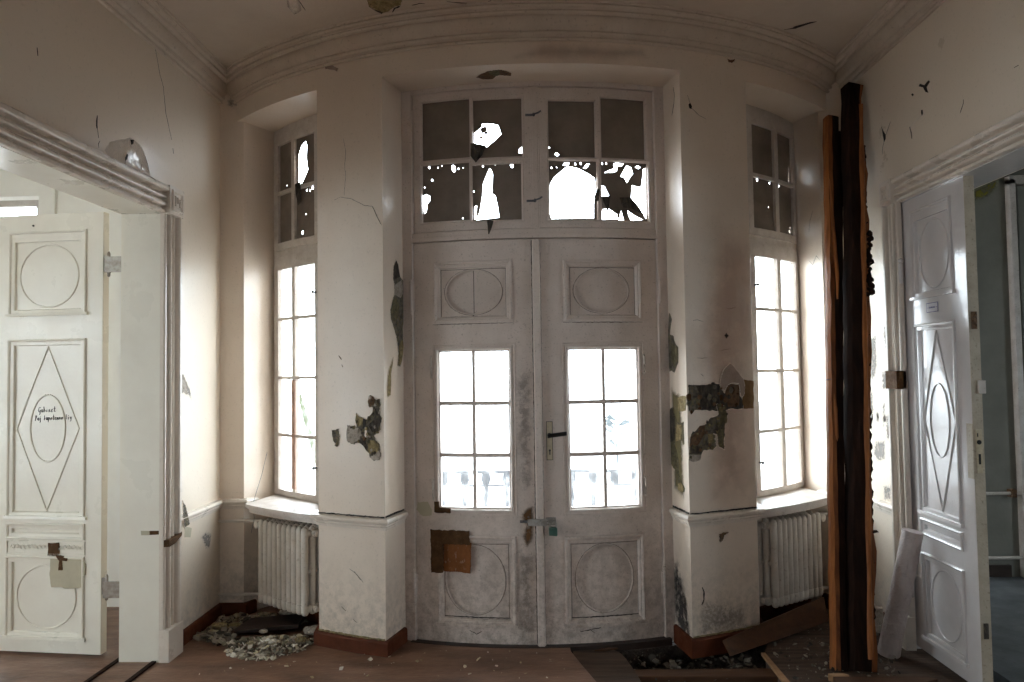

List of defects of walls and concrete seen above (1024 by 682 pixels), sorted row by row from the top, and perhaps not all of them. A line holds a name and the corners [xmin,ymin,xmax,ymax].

peeling [366,0,403,14]
spalling [476,69,512,80]
spalling [331,259,404,461]
spalling [668,313,678,372]
flaking render [670,363,754,494]